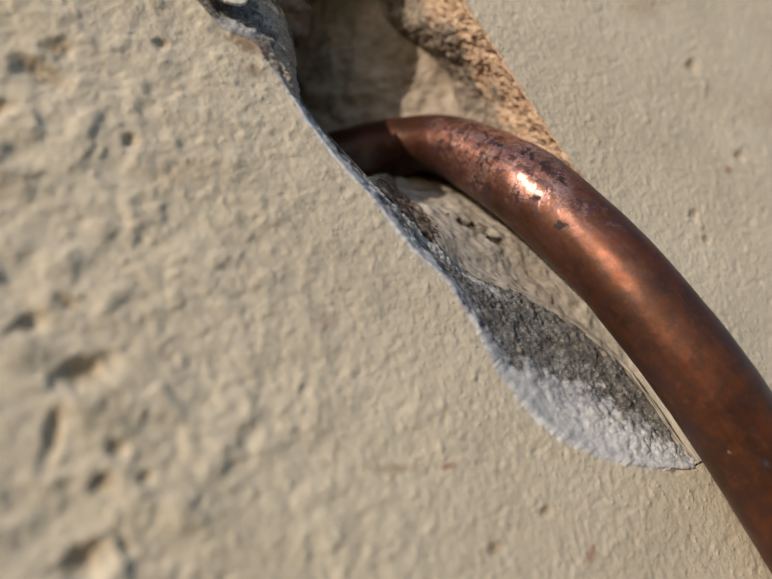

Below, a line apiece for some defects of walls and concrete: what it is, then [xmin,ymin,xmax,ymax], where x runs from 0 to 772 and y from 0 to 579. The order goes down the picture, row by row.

spalling [197,0,697,471]